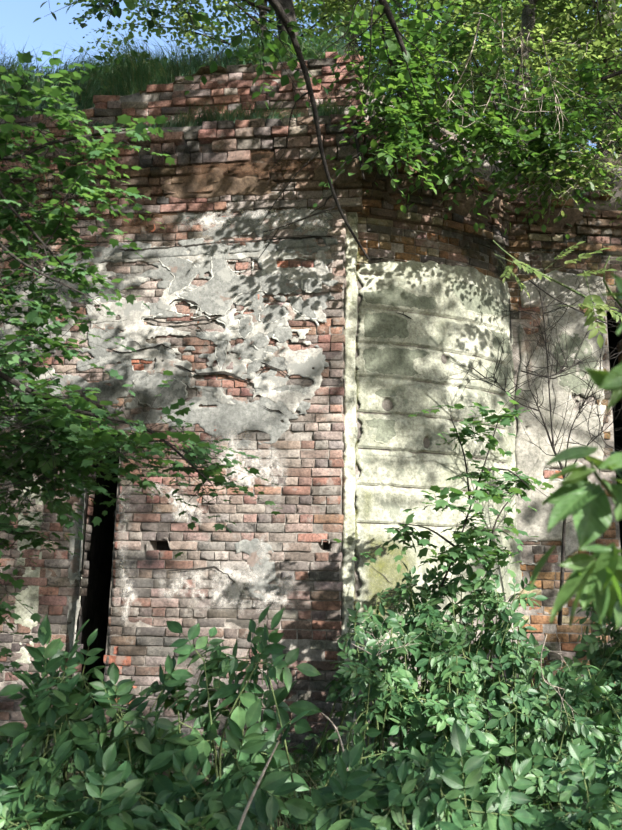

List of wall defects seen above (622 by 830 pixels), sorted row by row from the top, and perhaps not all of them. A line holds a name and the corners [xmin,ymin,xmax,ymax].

flaking render [127,254,322,408]